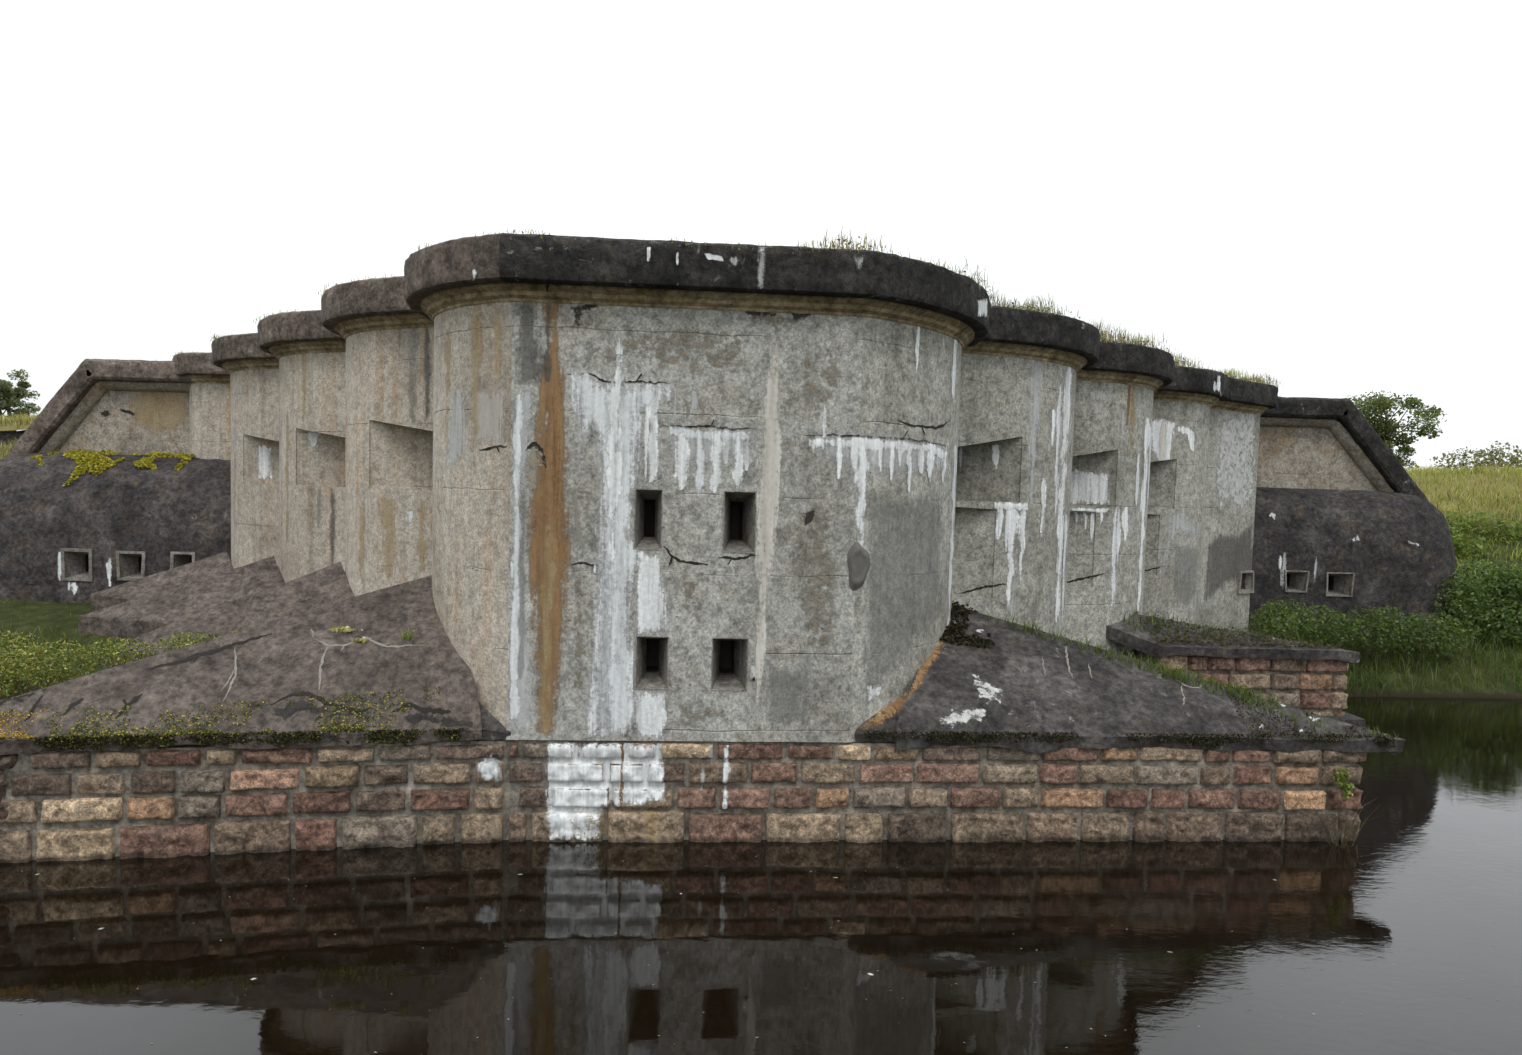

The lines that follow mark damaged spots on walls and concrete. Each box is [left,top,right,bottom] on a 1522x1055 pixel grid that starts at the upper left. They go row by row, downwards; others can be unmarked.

corrosion [528,302,571,733]
water stain [545,338,783,841]
crack [664,546,756,566]
water stain [809,405,962,626]
water stain [942,334,957,399]
water stain [992,444,1000,469]
water stain [994,362,1195,622]